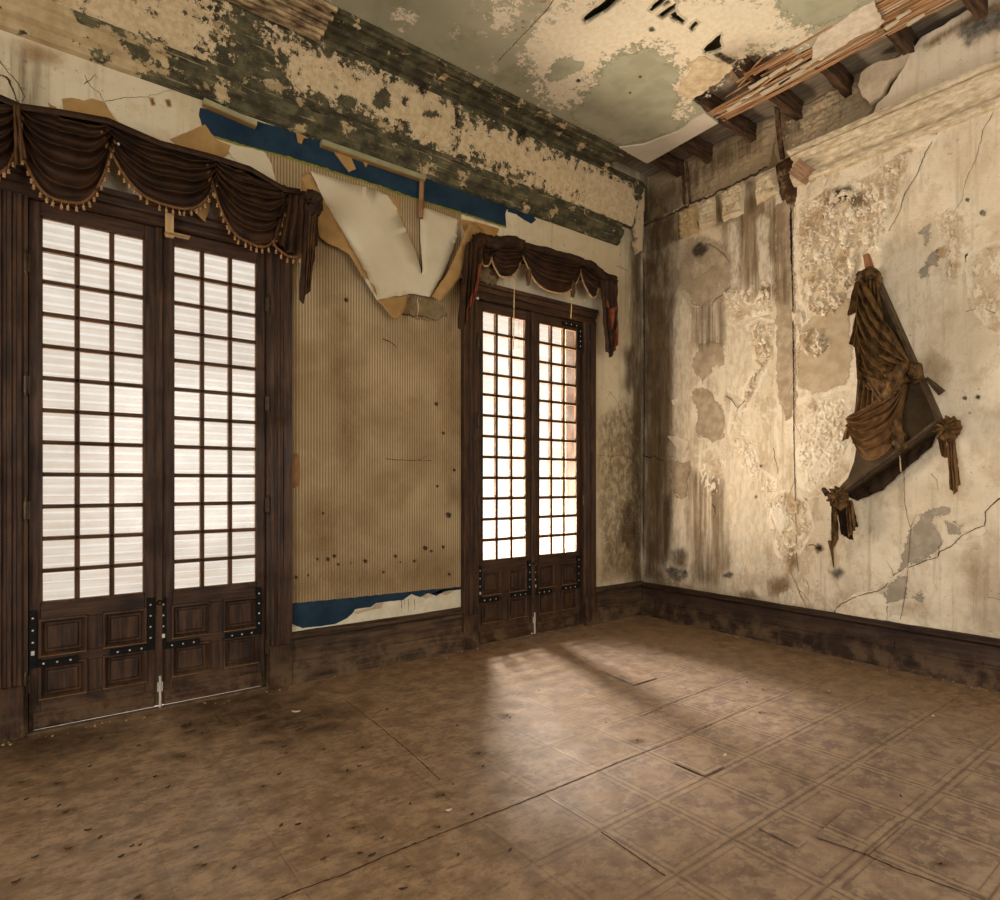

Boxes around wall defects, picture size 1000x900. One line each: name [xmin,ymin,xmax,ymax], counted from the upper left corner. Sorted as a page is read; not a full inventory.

peeling [50,0,897,227]
water stain [729,201,785,295]
flaking render [760,200,852,421]
flaking render [919,224,947,279]
water stain [602,193,732,581]
crack [763,203,805,572]
flaking render [292,588,461,632]
water stain [770,560,809,608]
crack [834,478,1000,620]
flaking render [883,506,963,614]